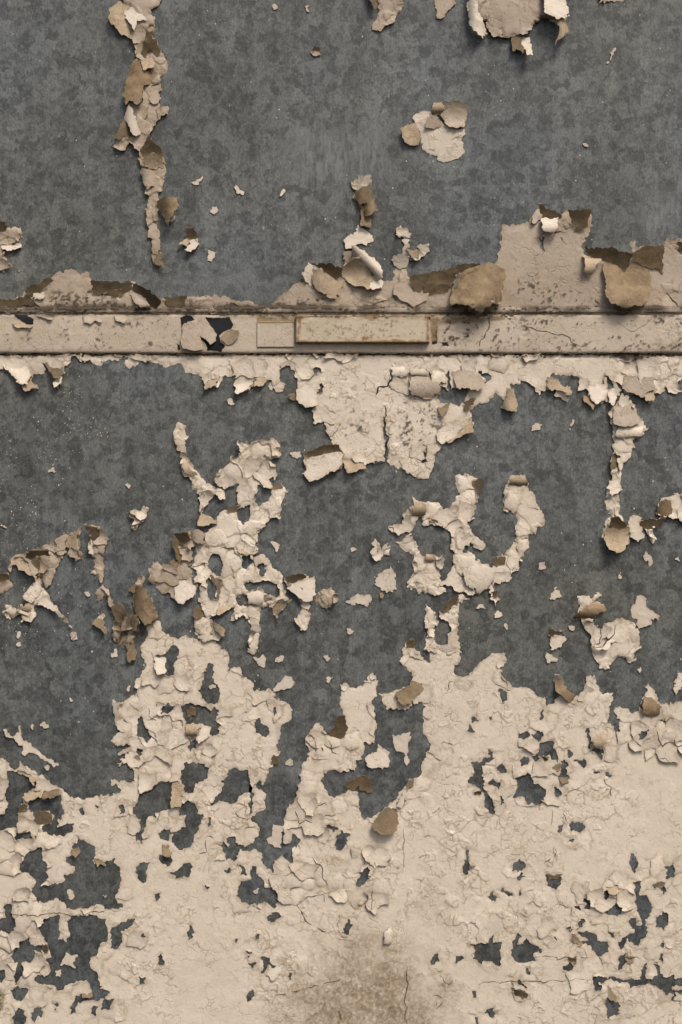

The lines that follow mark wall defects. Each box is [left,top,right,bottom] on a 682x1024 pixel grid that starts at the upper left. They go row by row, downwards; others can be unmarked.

peeling [370,0,404,32]
peeling [434,0,570,55]
peeling [108,0,180,268]
peeling [400,99,468,163]
peeling [0,175,682,553]
peeling [0,422,682,1024]
crack [657,717,682,763]
crack [12,909,124,917]
crack [297,857,329,932]
crack [402,971,410,1023]
crack [479,956,589,985]